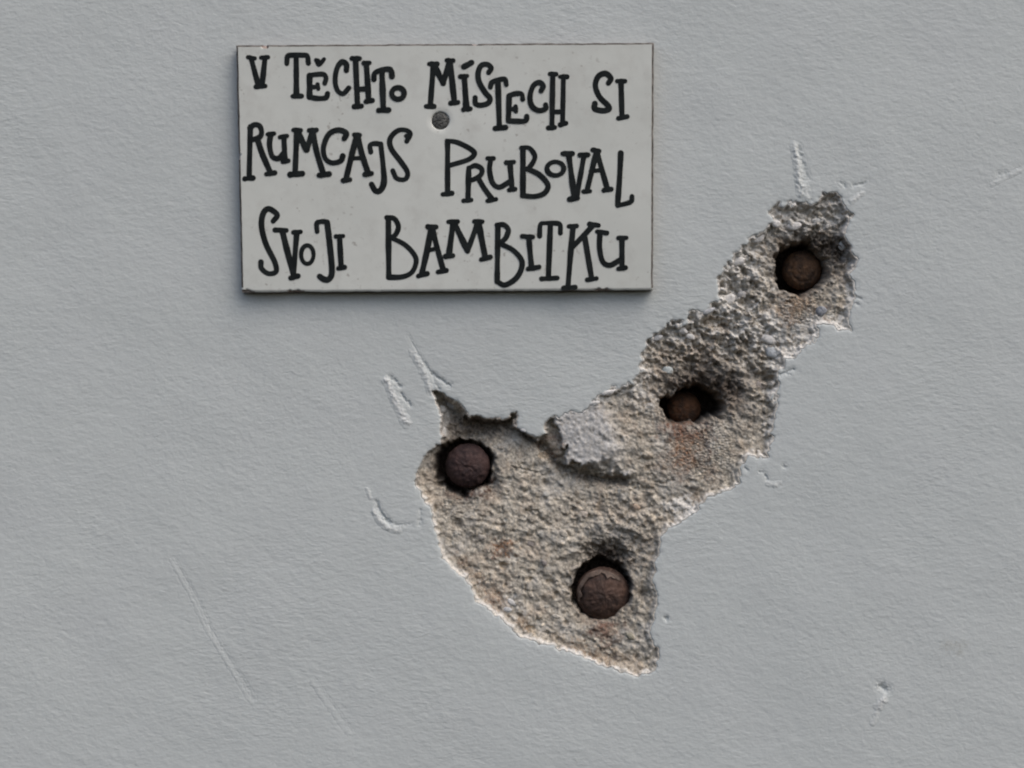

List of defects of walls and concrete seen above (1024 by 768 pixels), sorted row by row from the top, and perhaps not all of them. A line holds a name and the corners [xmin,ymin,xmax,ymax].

rust [577,569,620,601]
flaking render [365,179,869,677]